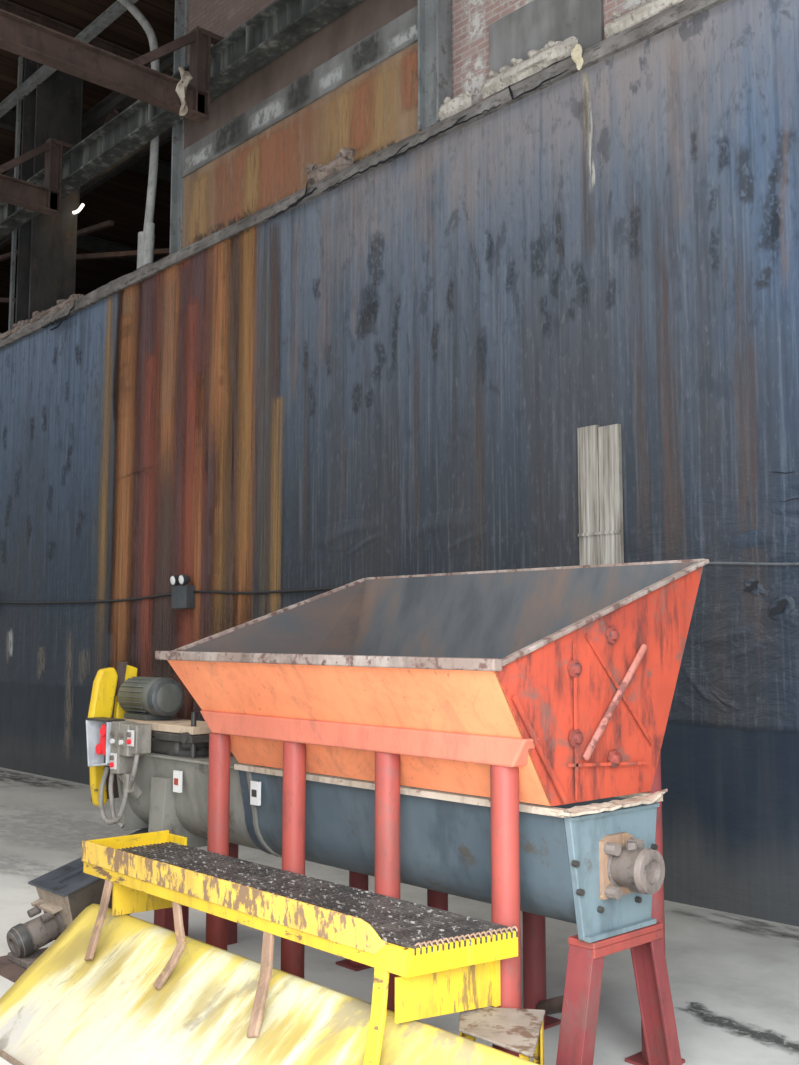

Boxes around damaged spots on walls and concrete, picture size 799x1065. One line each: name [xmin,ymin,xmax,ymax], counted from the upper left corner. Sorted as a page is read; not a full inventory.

water stain [186,67,342,168]
water stain [392,25,418,48]
flaking render [464,0,485,41]
spalling [438,36,578,121]
efflorescence [571,44,595,186]
corrosion [101,227,255,696]
corrosion [268,226,281,613]
crack [682,1002,799,1051]